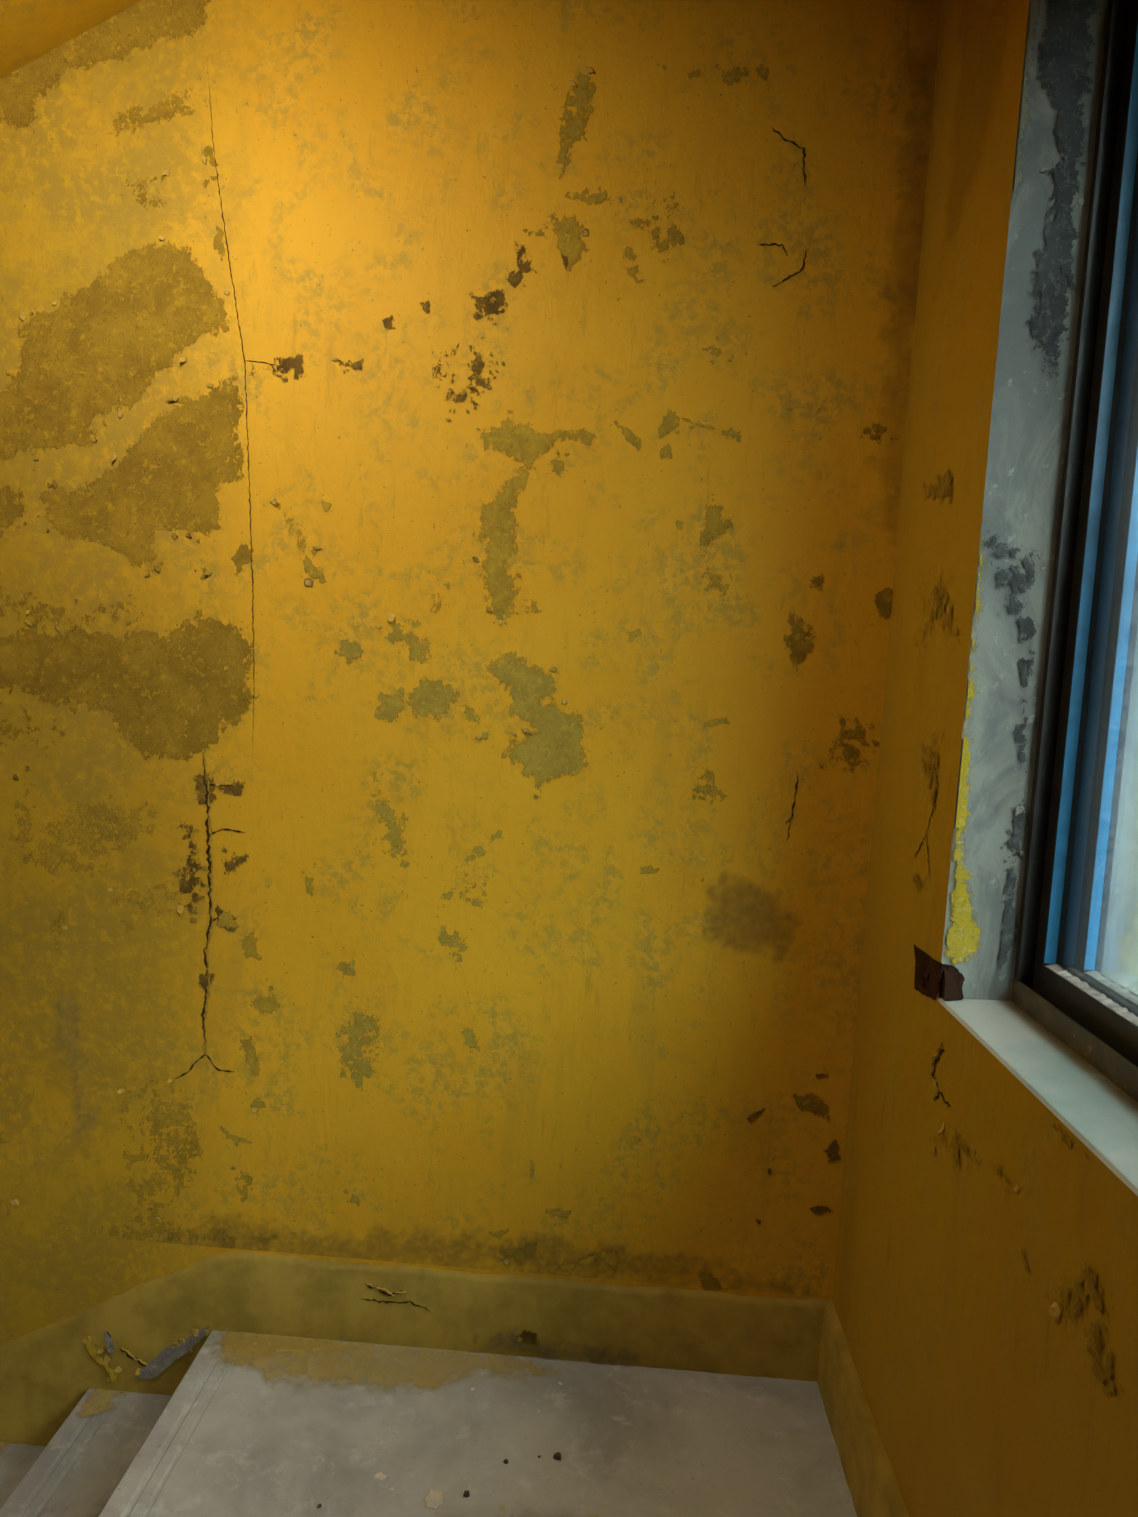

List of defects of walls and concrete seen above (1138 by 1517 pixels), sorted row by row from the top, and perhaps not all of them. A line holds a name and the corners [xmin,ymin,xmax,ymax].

peeling [623,192,687,284]
crack [207,73,279,742]
flaking render [332,358,364,373]
peeling [432,67,622,626]
peeling [658,409,741,459]
peeling [270,497,326,587]
peeling [700,503,734,596]
peeling [334,640,364,664]
peeling [374,583,488,739]
peeling [485,652,589,799]
crack [174,745,245,1079]
flaking render [135,1323,212,1379]